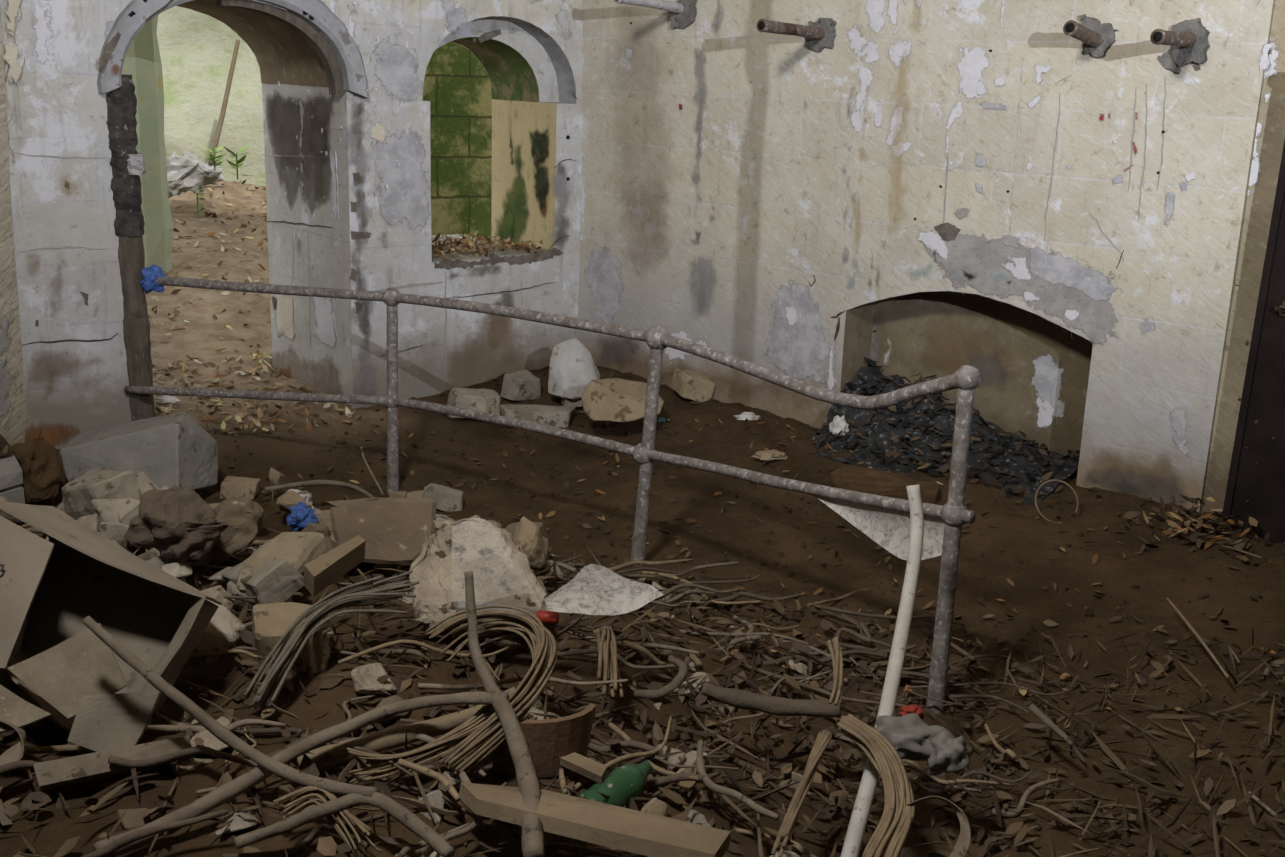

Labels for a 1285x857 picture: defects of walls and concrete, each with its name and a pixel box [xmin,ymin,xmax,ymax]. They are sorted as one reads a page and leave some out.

spalling [99,0,147,72]
peeling [321,0,433,240]
peeling [440,0,502,43]
peeling [843,0,926,158]
spalling [914,43,1121,349]
peeling [1164,172,1195,227]